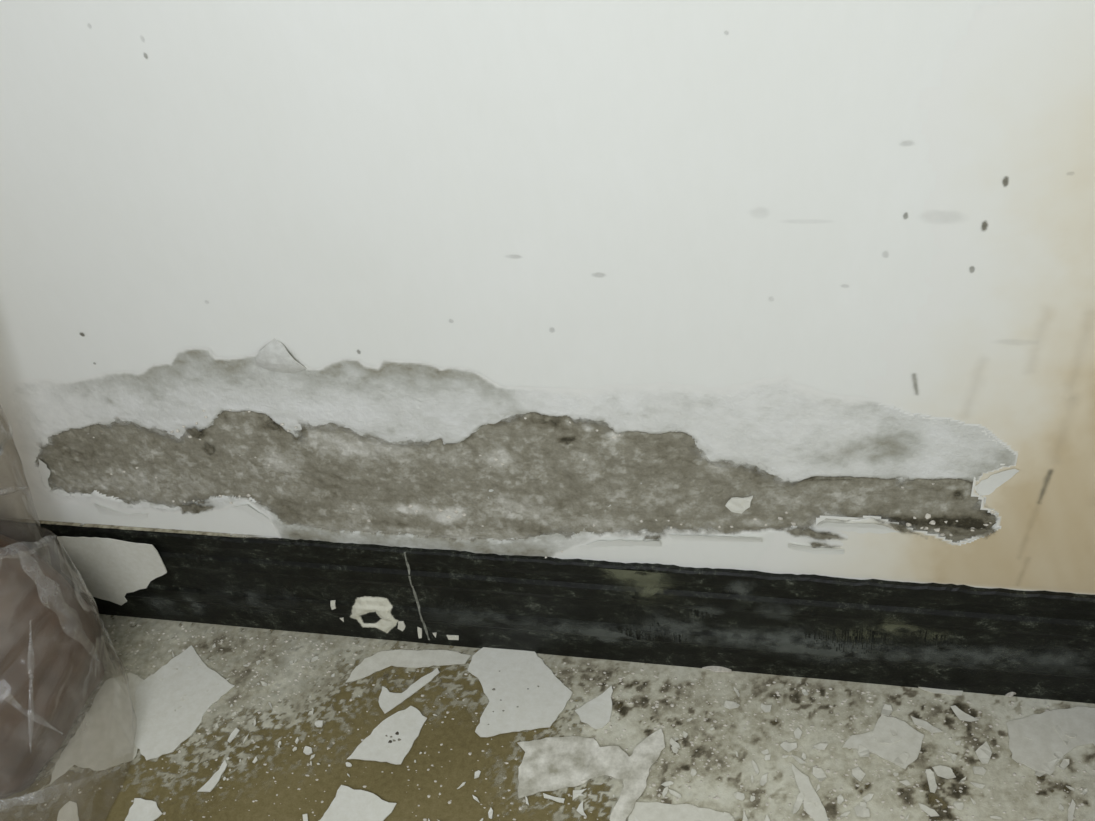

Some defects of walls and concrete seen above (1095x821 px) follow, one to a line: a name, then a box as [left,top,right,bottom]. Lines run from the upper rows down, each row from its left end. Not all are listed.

spalling [5,339,1019,558]
leakage [757,0,1095,595]